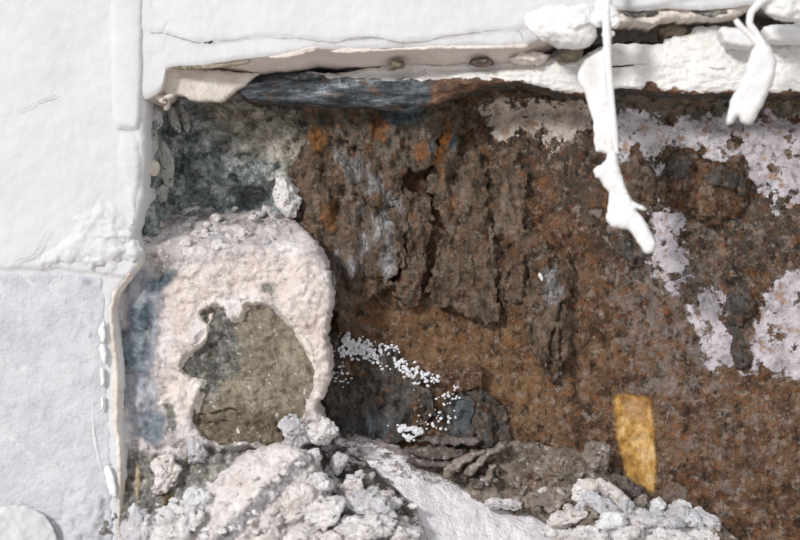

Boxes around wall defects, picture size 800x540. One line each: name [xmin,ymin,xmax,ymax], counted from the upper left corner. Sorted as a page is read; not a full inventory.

peeling [154,60,260,111]
corrosion [307,124,327,152]
corrosion [622,147,753,230]
peeling [616,108,800,216]
peeling [288,96,593,450]
corrosion [616,232,655,282]
spalling [177,299,314,446]
leakage [333,331,440,390]
leakage [387,385,461,442]
corrosion [614,393,657,491]
corrosion [725,280,756,369]
peeling [686,268,800,381]